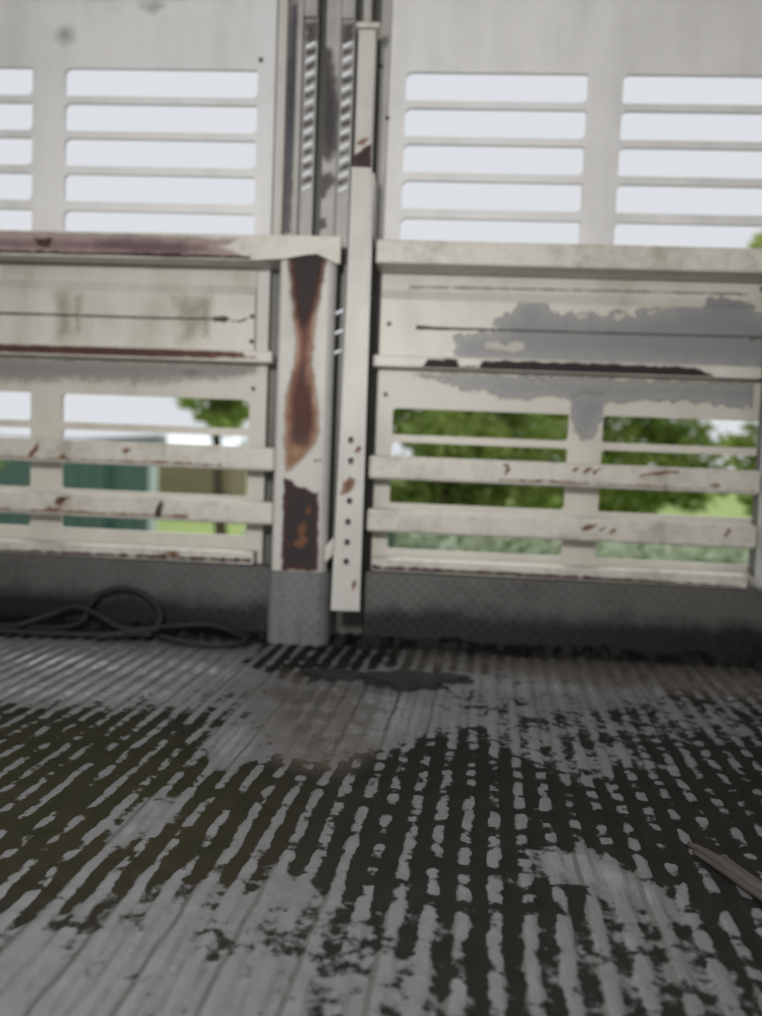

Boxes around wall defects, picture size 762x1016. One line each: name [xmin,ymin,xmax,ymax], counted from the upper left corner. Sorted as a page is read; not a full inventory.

rust [0,232,250,259]
rust [0,344,254,358]
peeling [453,296,762,367]
rust [281,255,326,571]
peeling [418,373,754,440]